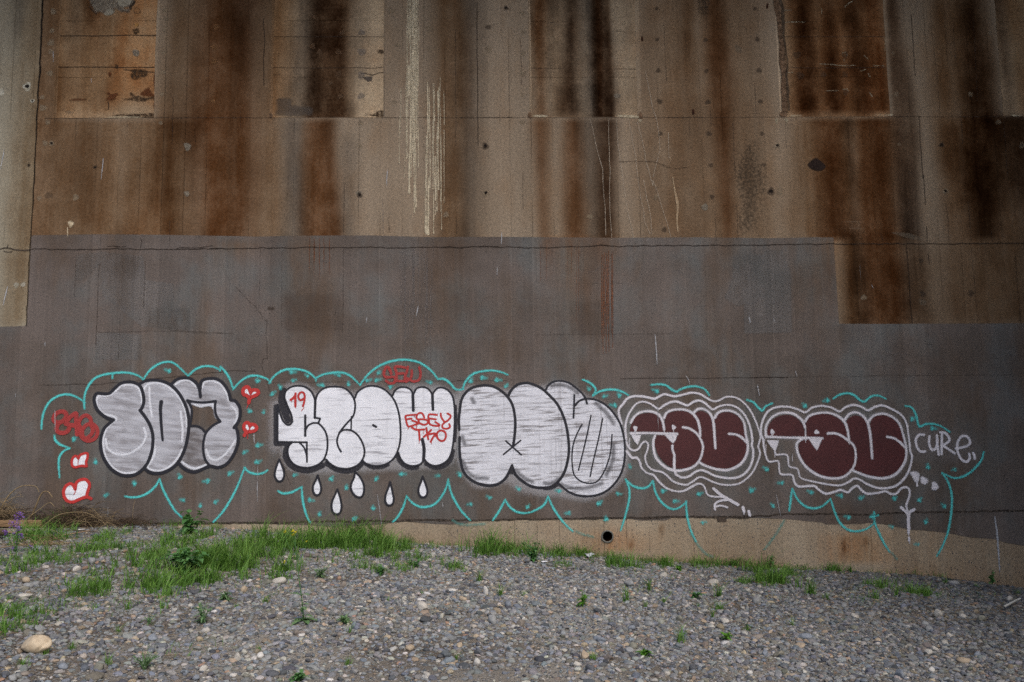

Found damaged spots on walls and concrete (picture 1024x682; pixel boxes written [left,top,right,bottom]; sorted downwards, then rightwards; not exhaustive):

rust [563,0,574,111]
rust [598,121,613,238]